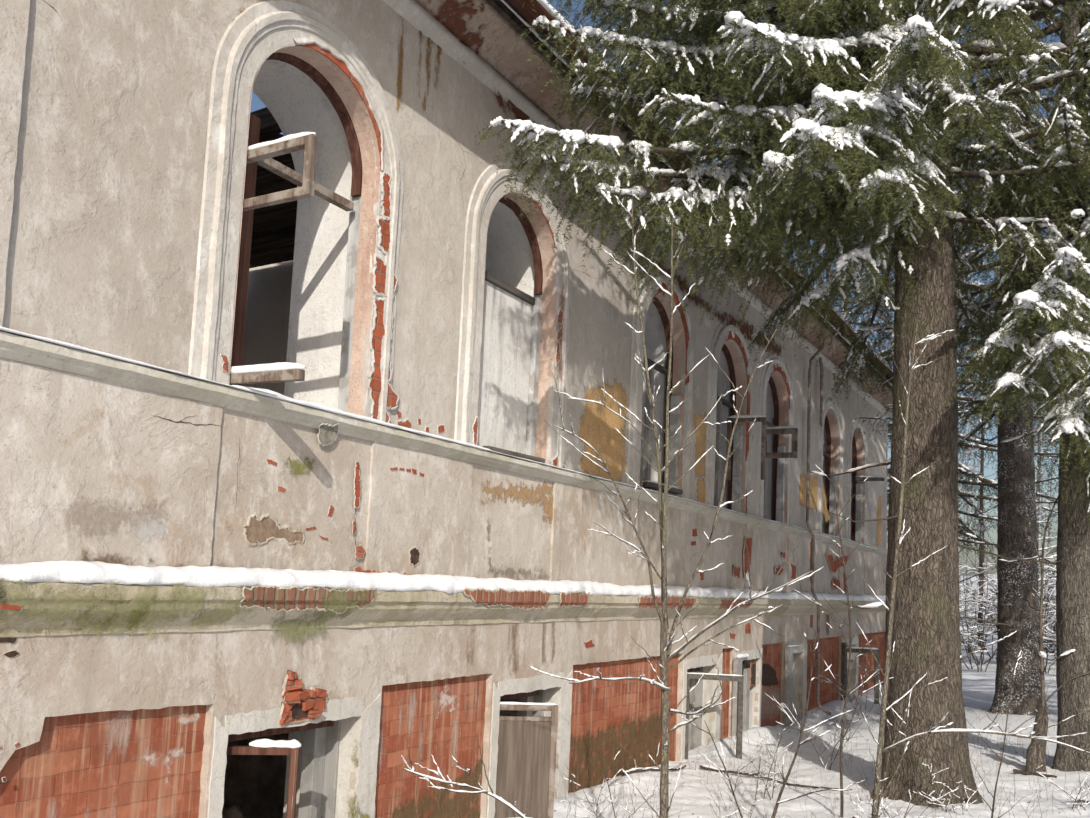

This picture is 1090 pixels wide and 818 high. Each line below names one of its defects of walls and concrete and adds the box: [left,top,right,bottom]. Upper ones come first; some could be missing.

flaking render [429,0,484,55]
flaking render [495,91,538,125]
flaking render [293,37,445,434]
peeling [578,380,628,482]
crack [155,416,241,503]
flaking render [242,512,329,548]
spalling [353,545,420,575]
flaking render [240,585,376,614]
flaking render [463,588,590,611]
flaking render [279,670,329,726]
water stain [570,713,661,793]